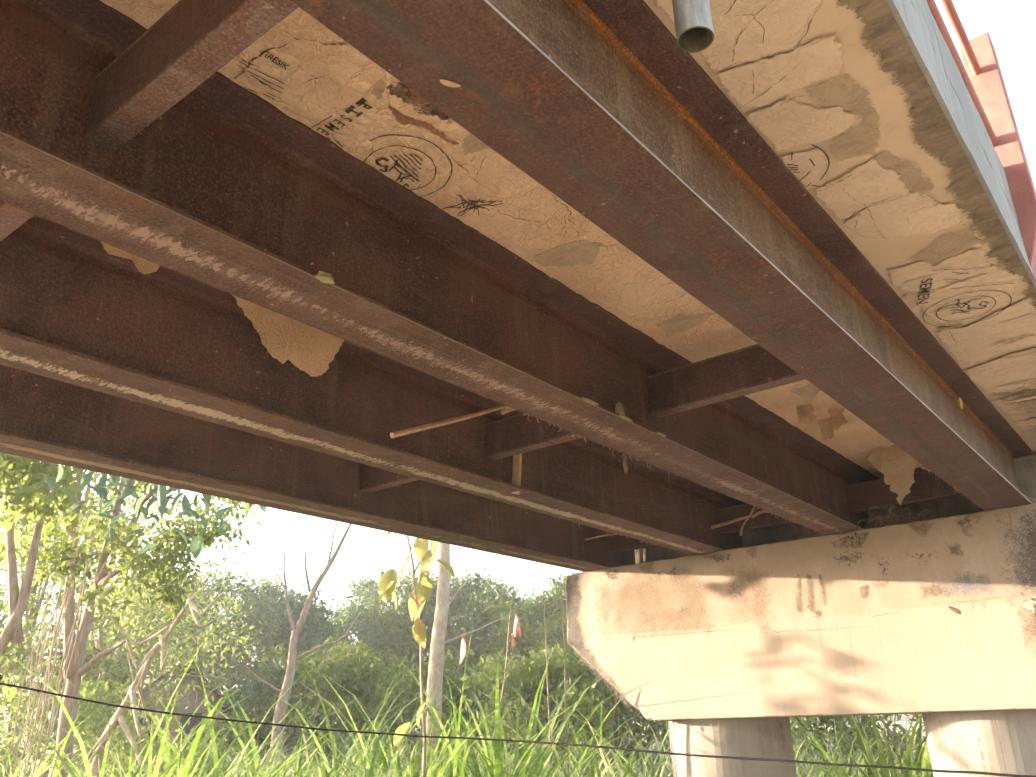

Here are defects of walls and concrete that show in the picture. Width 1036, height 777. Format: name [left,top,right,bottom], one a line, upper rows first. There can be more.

spalling [372,80,453,124]
peeling [462,135,490,155]
damp [837,0,1036,310]
rust [563,0,1005,453]
peeling [0,165,852,570]
damp [997,385,1036,404]
damp [1005,510,1036,644]